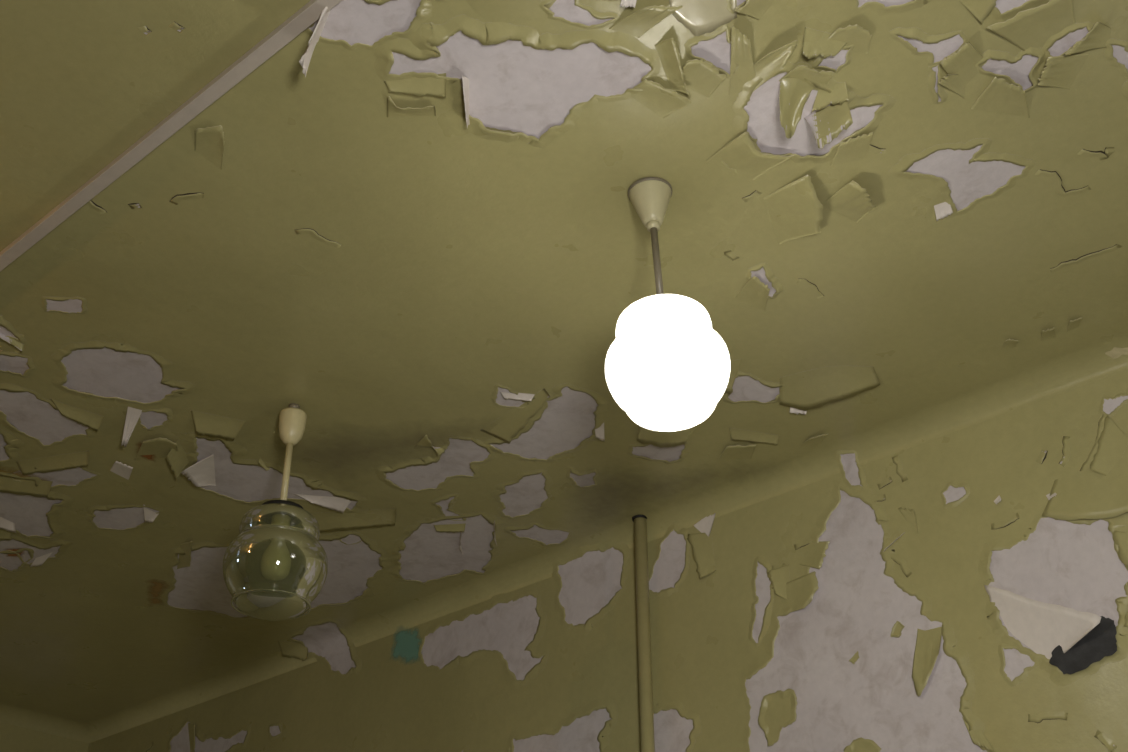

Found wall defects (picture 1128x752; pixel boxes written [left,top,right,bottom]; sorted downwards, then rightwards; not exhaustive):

peeling [299,0,1128,244]
peeling [0,315,630,689]
peeling [626,411,707,465]
peeling [649,513,716,599]
peeling [740,450,1001,752]
peeling [978,392,1128,687]
peeling [506,698,618,752]
peeling [653,701,702,752]